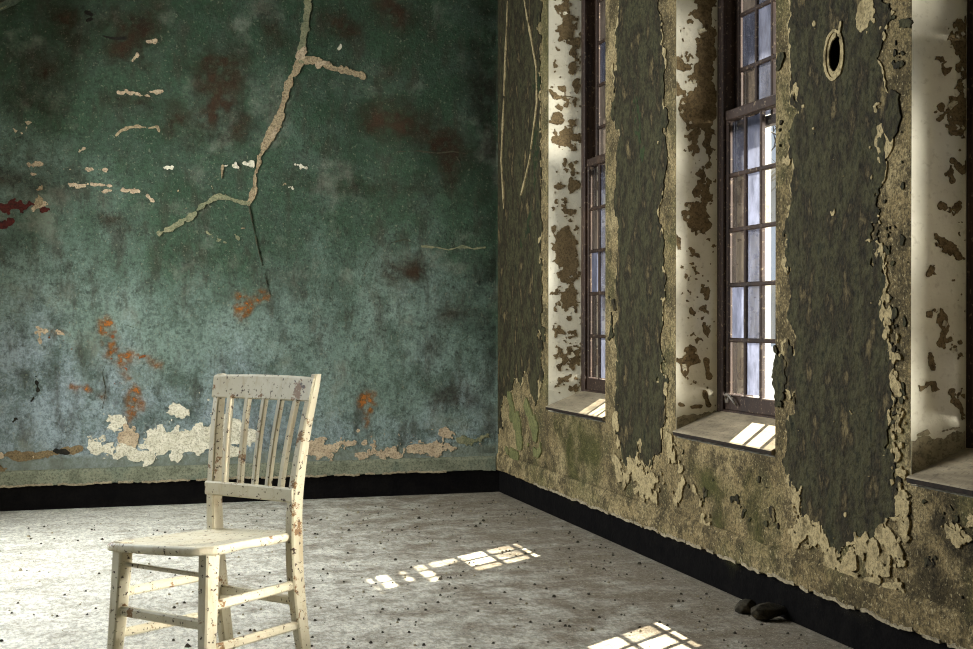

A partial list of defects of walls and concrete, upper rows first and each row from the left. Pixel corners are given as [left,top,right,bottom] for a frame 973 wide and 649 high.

peeling [117,89,164,97]
crack [156,0,366,294]
peeling [0,185,50,229]
peeling [68,167,155,202]
peeling [308,0,581,461]
peeling [608,0,717,526]
peeling [763,0,966,593]
rust [99,317,146,418]
peeling [0,402,212,472]
peeling [222,414,257,458]
spalling [0,478,207,488]
peeling [941,505,973,548]